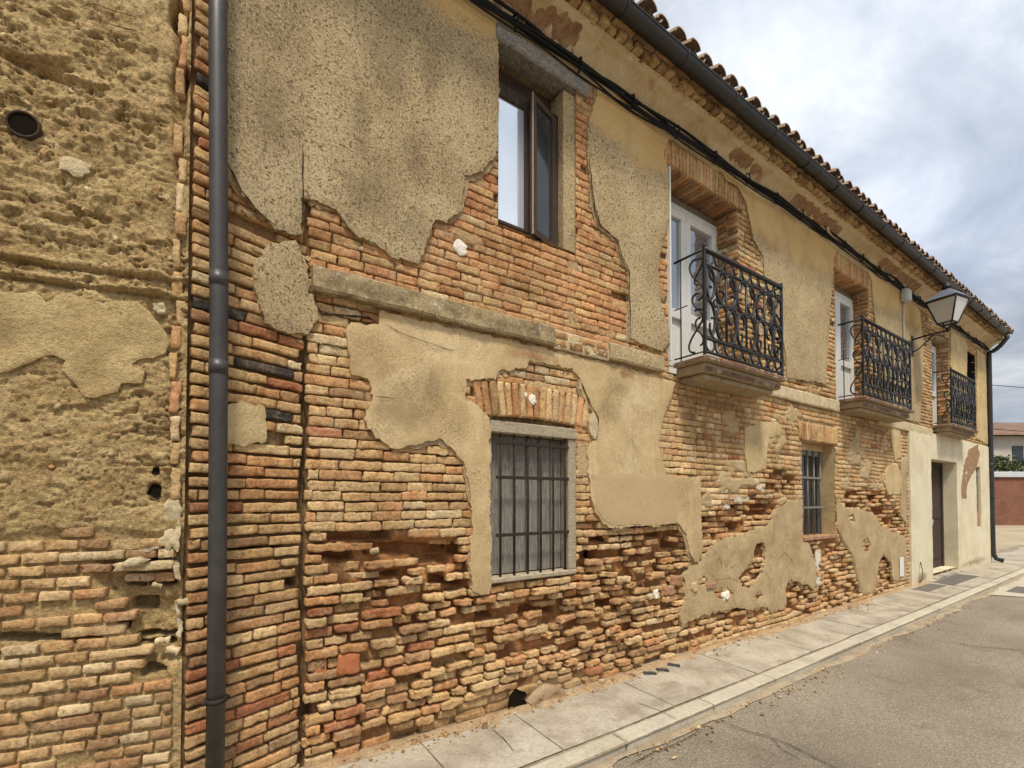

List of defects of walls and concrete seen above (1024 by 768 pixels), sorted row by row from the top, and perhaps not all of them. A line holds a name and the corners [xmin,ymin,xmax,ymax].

peeling [228,0,500,345]
peeling [304,271,924,674]
peeling [948,328,988,499]
spalling [112,556,181,588]
spalling [154,597,189,656]